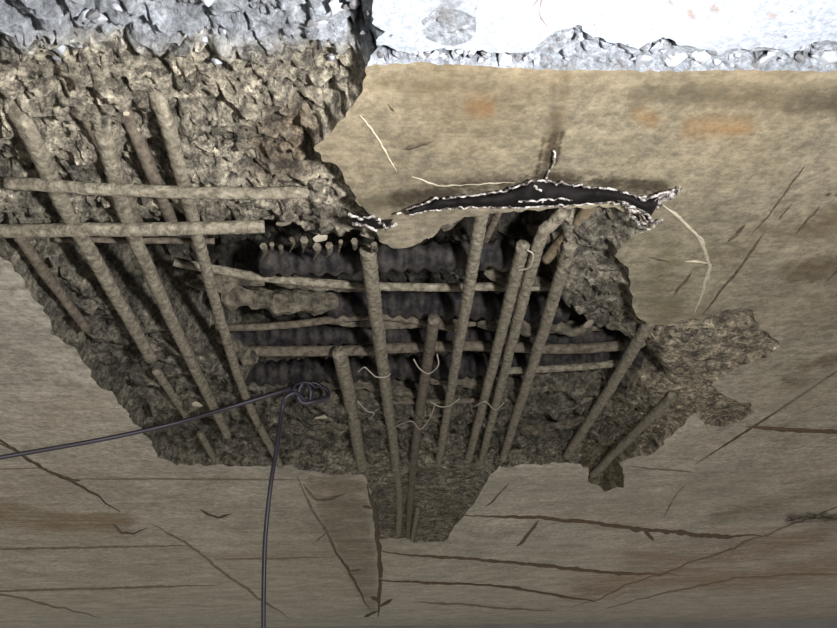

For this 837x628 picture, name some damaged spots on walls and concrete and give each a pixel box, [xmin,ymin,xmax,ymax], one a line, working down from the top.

crack [532,0,549,28]
spalling [0,0,837,429]
damp [390,132,667,206]
crack [674,273,692,295]
crack [703,166,805,314]
crack [796,206,820,234]
spalling [143,389,297,467]
spalling [230,206,781,543]
crack [0,439,290,619]
crack [297,476,837,617]